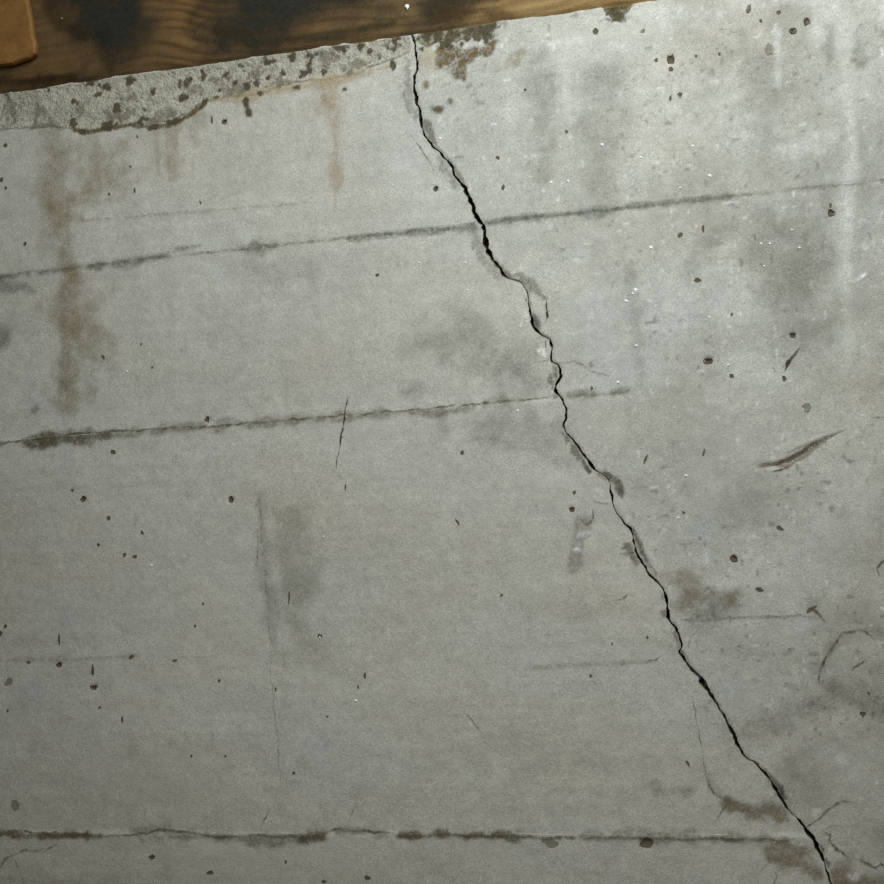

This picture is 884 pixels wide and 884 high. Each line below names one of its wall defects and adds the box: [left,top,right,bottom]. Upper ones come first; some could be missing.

spalling [0,22,500,134]
crack [336,397,348,467]
crack [403,36,847,884]
damp [766,840,875,884]